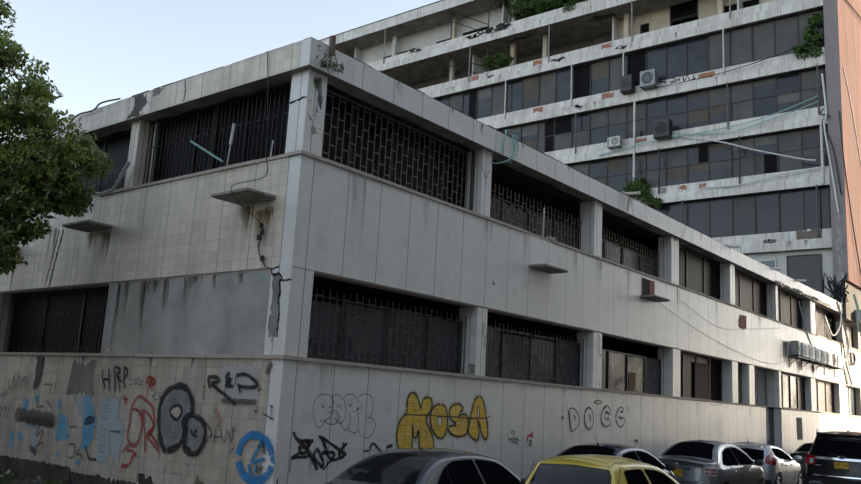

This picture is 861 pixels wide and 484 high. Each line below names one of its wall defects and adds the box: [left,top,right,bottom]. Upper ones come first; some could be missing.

spalling [0,455,153,484]